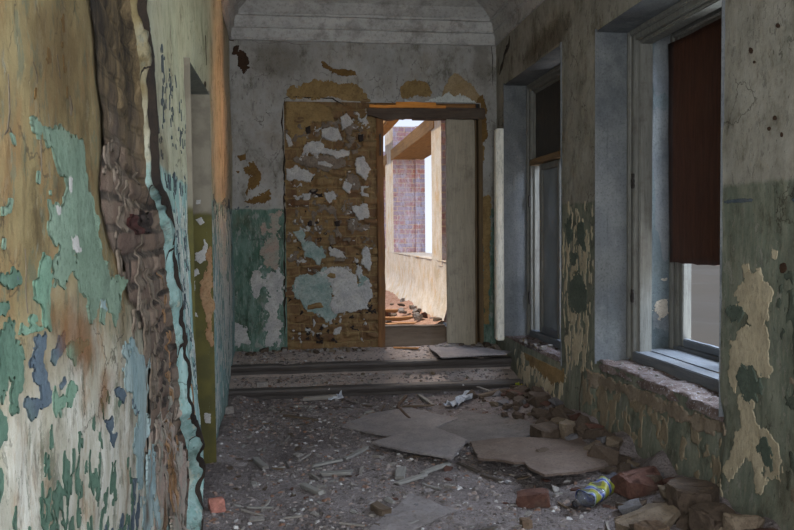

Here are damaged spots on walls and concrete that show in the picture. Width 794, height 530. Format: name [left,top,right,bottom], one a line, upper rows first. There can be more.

flaking render [0,0,271,530]
crack [137,0,206,530]
flaking render [250,61,376,348]
peeling [717,263,794,497]